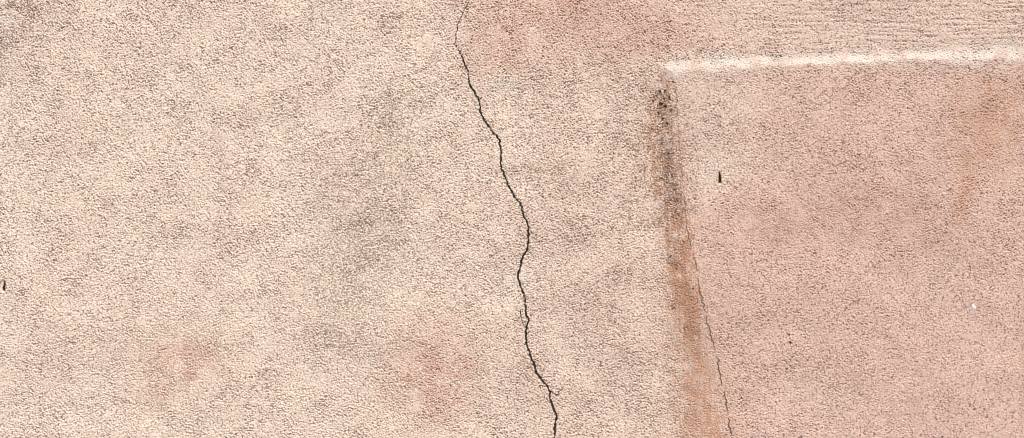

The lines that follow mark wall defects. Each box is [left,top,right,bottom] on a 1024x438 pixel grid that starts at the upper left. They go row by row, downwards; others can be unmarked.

crack [455,3,564,438]